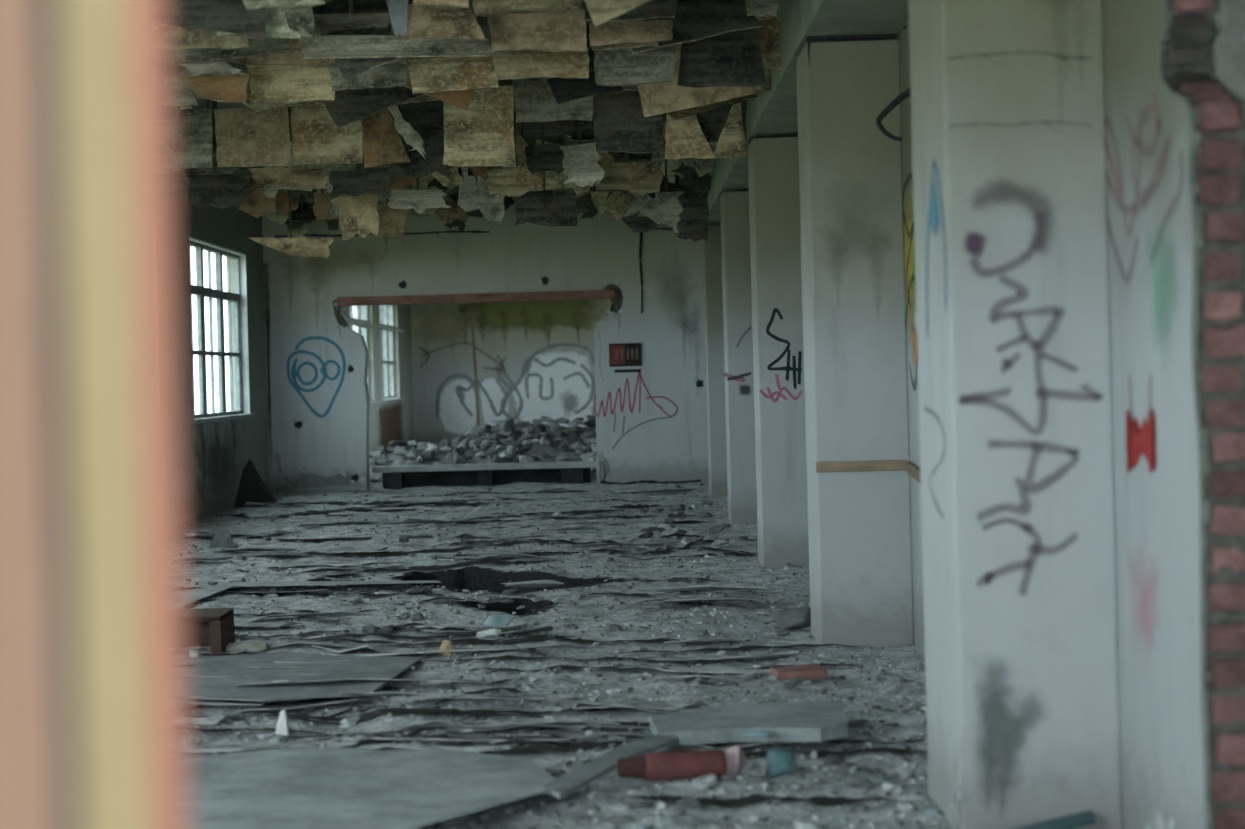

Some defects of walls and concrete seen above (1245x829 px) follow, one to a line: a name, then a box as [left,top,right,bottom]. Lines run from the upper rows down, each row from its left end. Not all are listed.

water stain [465,299,592,330]
spalling [1156,0,1245,829]
water stain [982,698,1019,785]